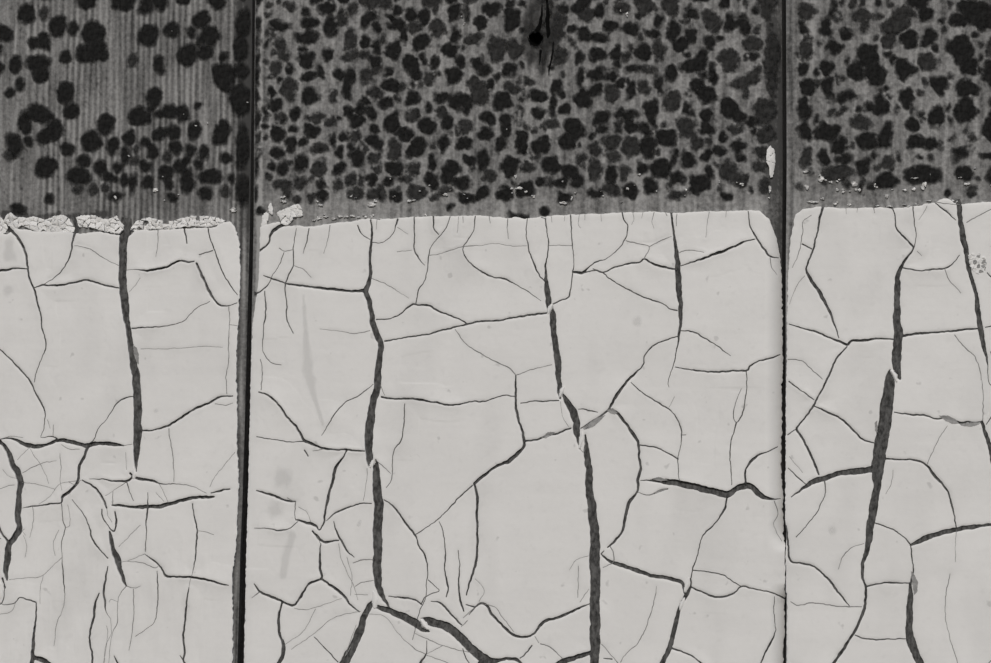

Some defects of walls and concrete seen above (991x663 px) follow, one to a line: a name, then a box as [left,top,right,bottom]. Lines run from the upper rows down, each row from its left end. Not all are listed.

damp [0,0,781,219]
damp [795,0,991,198]
peeling [0,207,237,234]
peeling [261,196,380,226]
peeling [766,146,776,199]
peeling [803,171,861,205]
peeling [863,173,931,207]
crack [0,199,991,663]